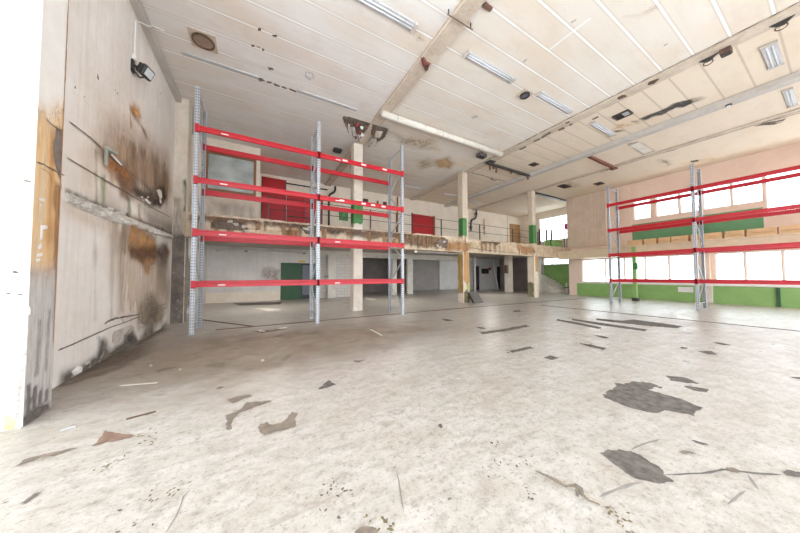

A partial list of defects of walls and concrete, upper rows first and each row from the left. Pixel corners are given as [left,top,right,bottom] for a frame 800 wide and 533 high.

rust [30,111,63,273]
spalling [64,191,173,239]
rust [122,225,169,290]
spalling [211,220,282,235]
spalling [470,242,515,253]
spalling [536,247,563,257]
leakage [23,137,191,427]
crack [535,470,600,505]